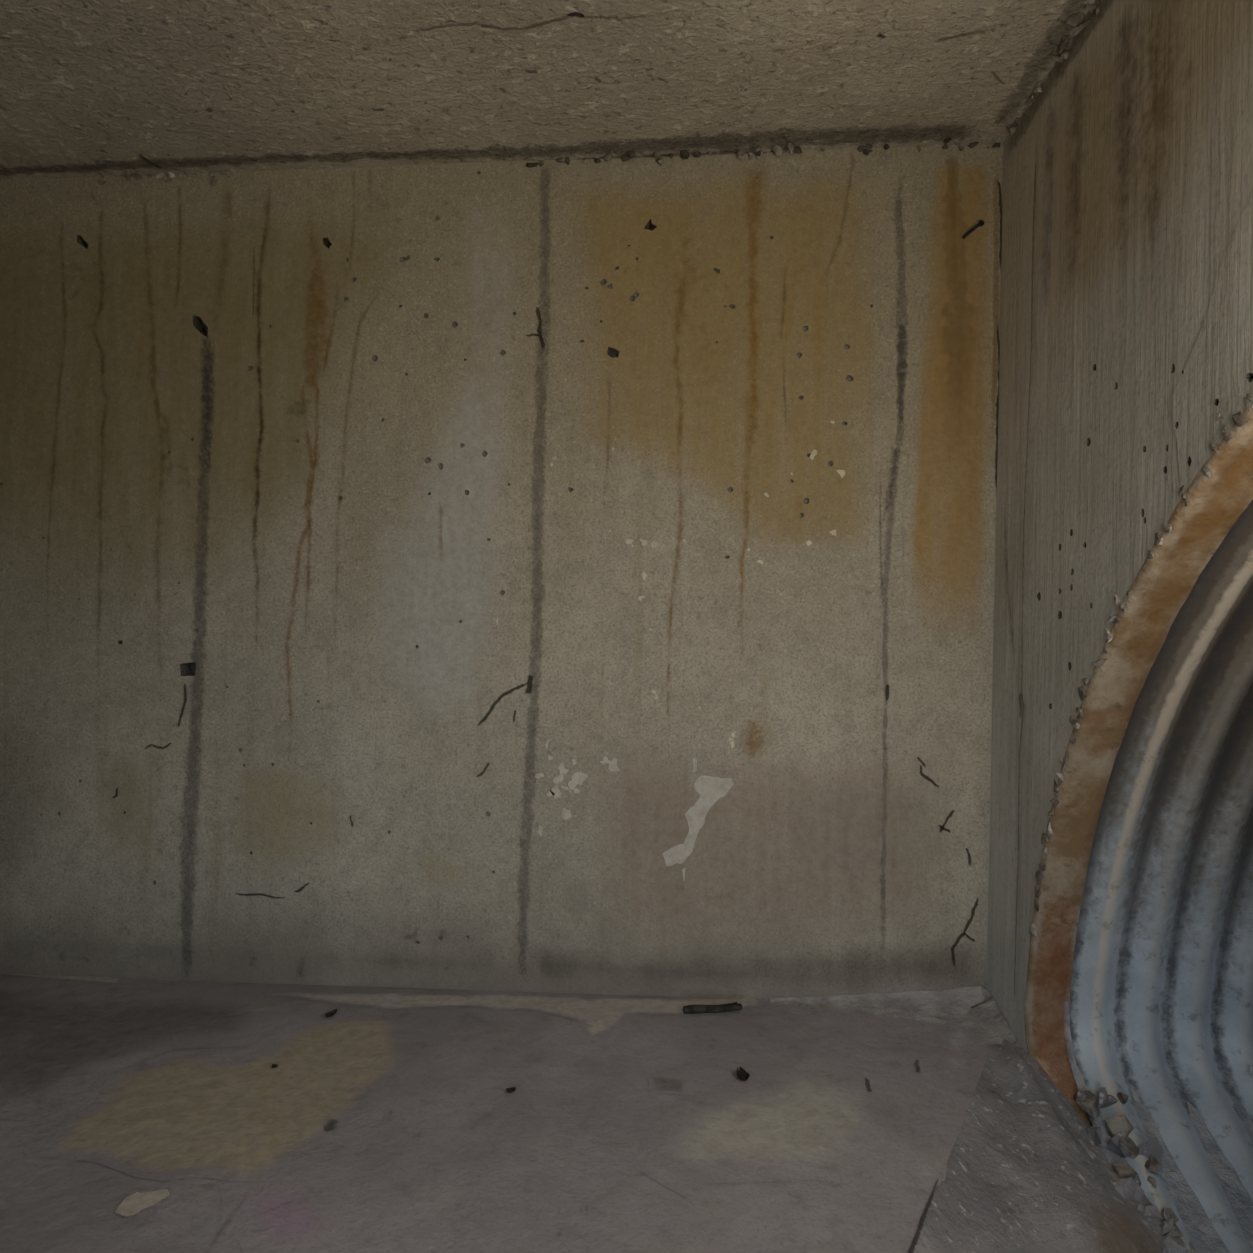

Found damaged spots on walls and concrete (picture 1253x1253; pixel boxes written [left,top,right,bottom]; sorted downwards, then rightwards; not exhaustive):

spalling [942,0,1101,151]
spalling [526,150,635,168]
water stain [0,167,538,753]
corrosion [546,147,1000,652]
crack [479,676,533,724]
water stain [84,732,179,874]
water stain [207,743,363,890]
peeling [662,757,734,892]
crack [917,757,972,865]
crack [951,899,978,965]
spalling [1075,1087,1187,1253]